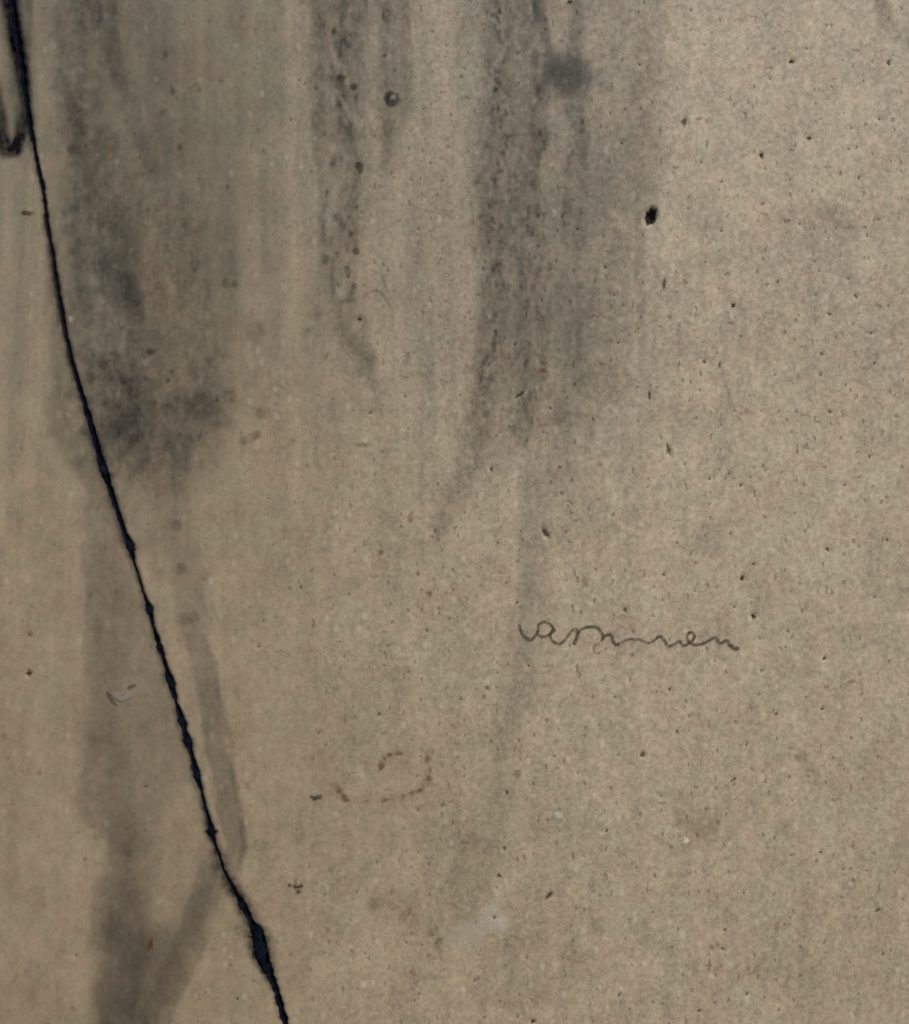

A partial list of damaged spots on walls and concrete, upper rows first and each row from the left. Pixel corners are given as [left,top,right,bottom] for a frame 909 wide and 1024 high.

crack [9,0,288,1024]